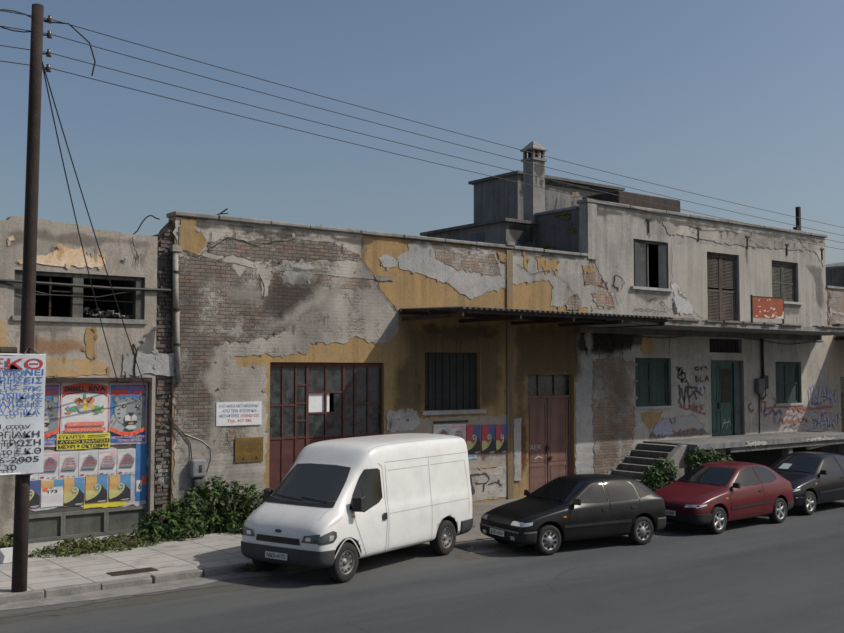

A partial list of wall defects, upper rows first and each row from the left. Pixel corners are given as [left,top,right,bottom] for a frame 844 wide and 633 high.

peeling [36,244,106,269]
flaking render [379,241,614,311]
flaking render [827,288,844,333]
flaking render [172,217,400,523]
flaking render [574,333,663,474]
flaking render [387,414,522,502]